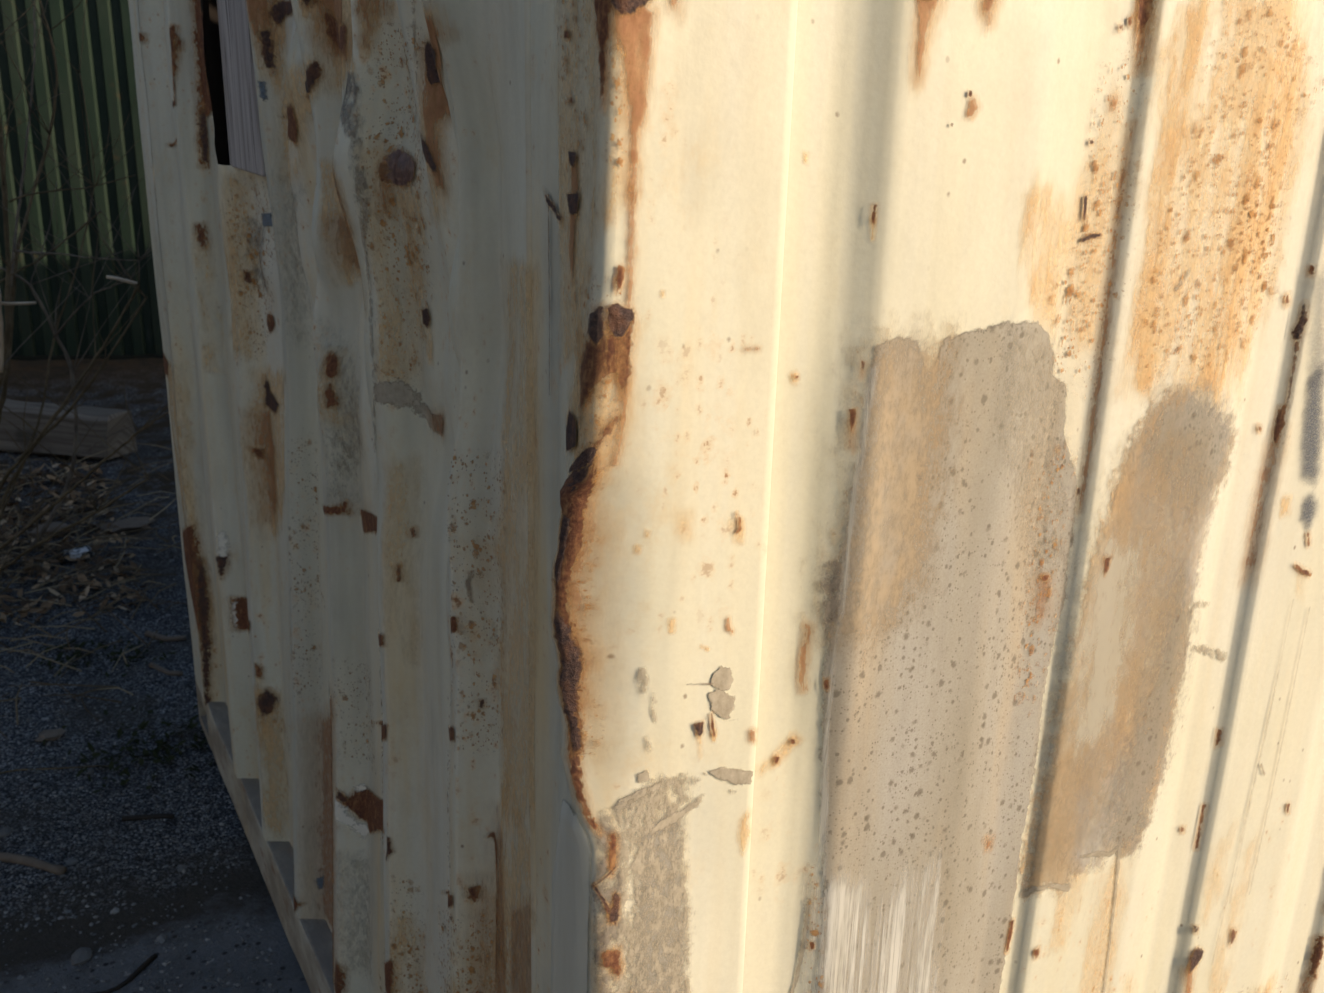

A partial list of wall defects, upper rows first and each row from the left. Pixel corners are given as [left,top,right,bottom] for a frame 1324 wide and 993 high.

corrosion [169,0,212,168]
corrosion [246,0,451,376]
corrosion [1047,0,1154,509]
corrosion [1135,0,1317,400]
corrosion [183,525,213,704]
corrosion [255,663,278,716]
corrosion [323,493,402,533]
corrosion [379,348,536,993]
corrosion [545,0,653,832]
corrosion [1246,294,1308,567]
corrosion [315,699,384,993]
corrosion [1298,936,1324,993]